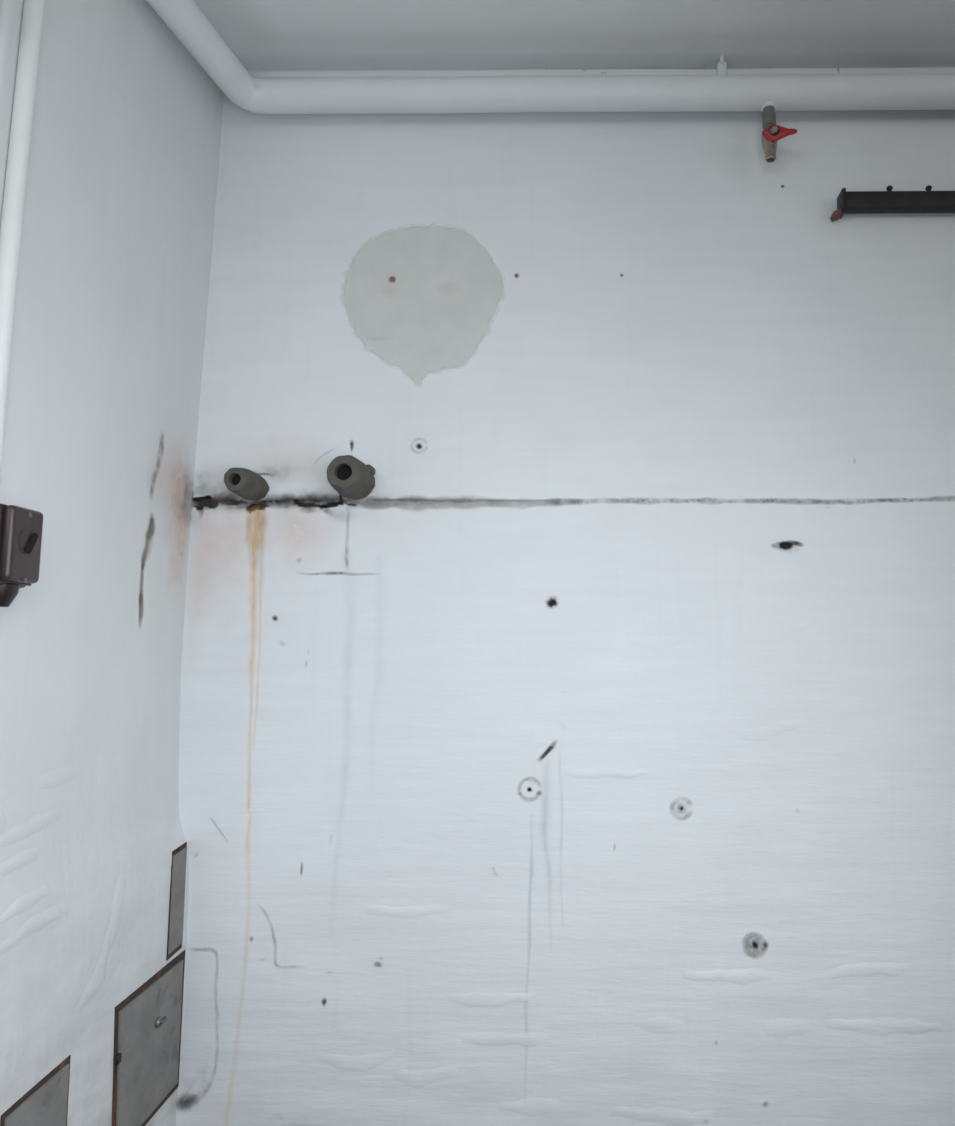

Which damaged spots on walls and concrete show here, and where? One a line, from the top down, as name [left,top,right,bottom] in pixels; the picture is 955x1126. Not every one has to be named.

peeling [342,225,504,386]
crack [195,497,495,506]
crack [752,497,843,505]
crack [872,495,938,503]
crack [139,517,154,622]